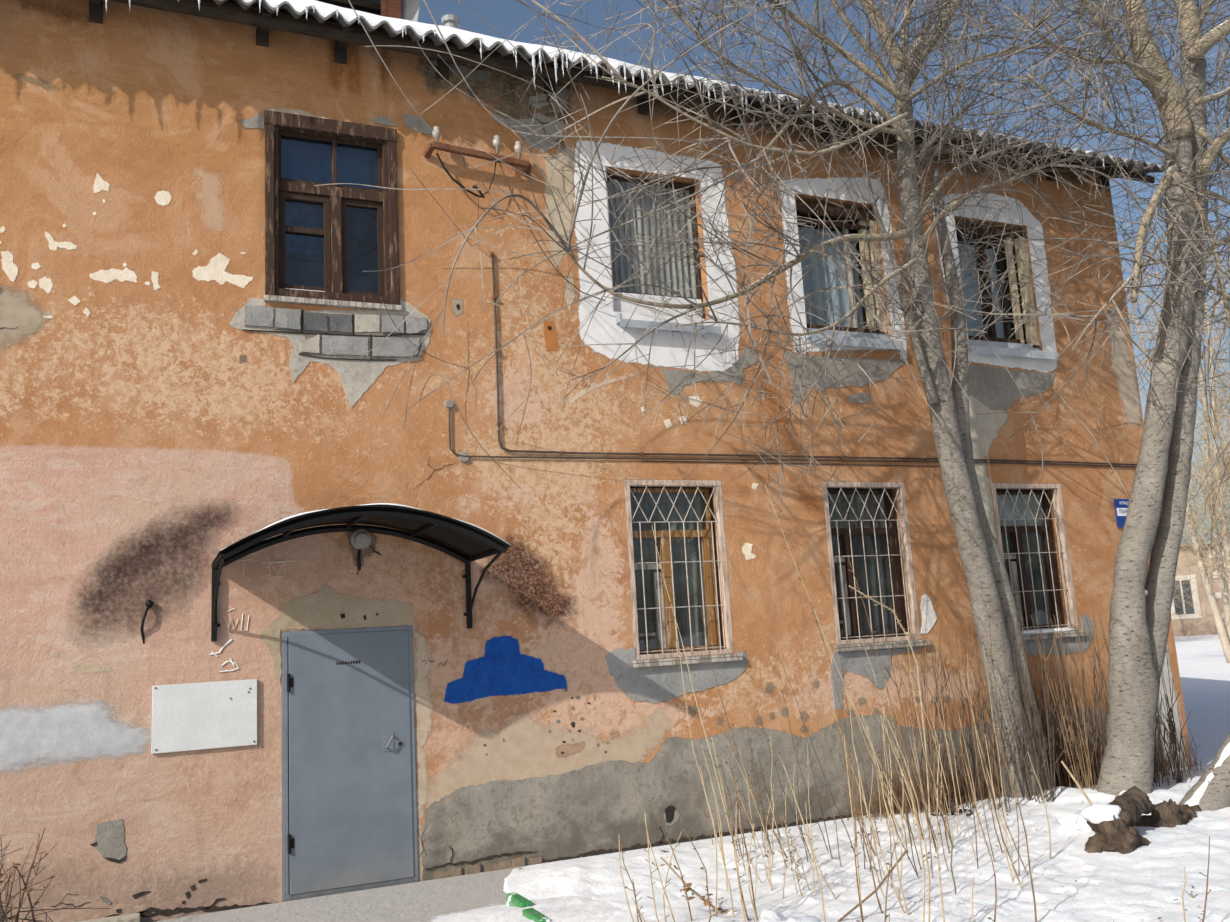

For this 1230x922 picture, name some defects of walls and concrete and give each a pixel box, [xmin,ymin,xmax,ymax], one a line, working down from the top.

peeling [93,173,110,215]
peeling [155,191,172,206]
peeling [45,224,77,251]
flaking render [0,226,54,347]
peeling [68,296,90,317]
peeling [89,263,161,290]
flaking render [192,249,431,408]
flaking render [969,395,1009,547]
flaking render [1038,706,1108,783]
flaking render [422,689,1001,881]
flaking render [90,819,127,863]